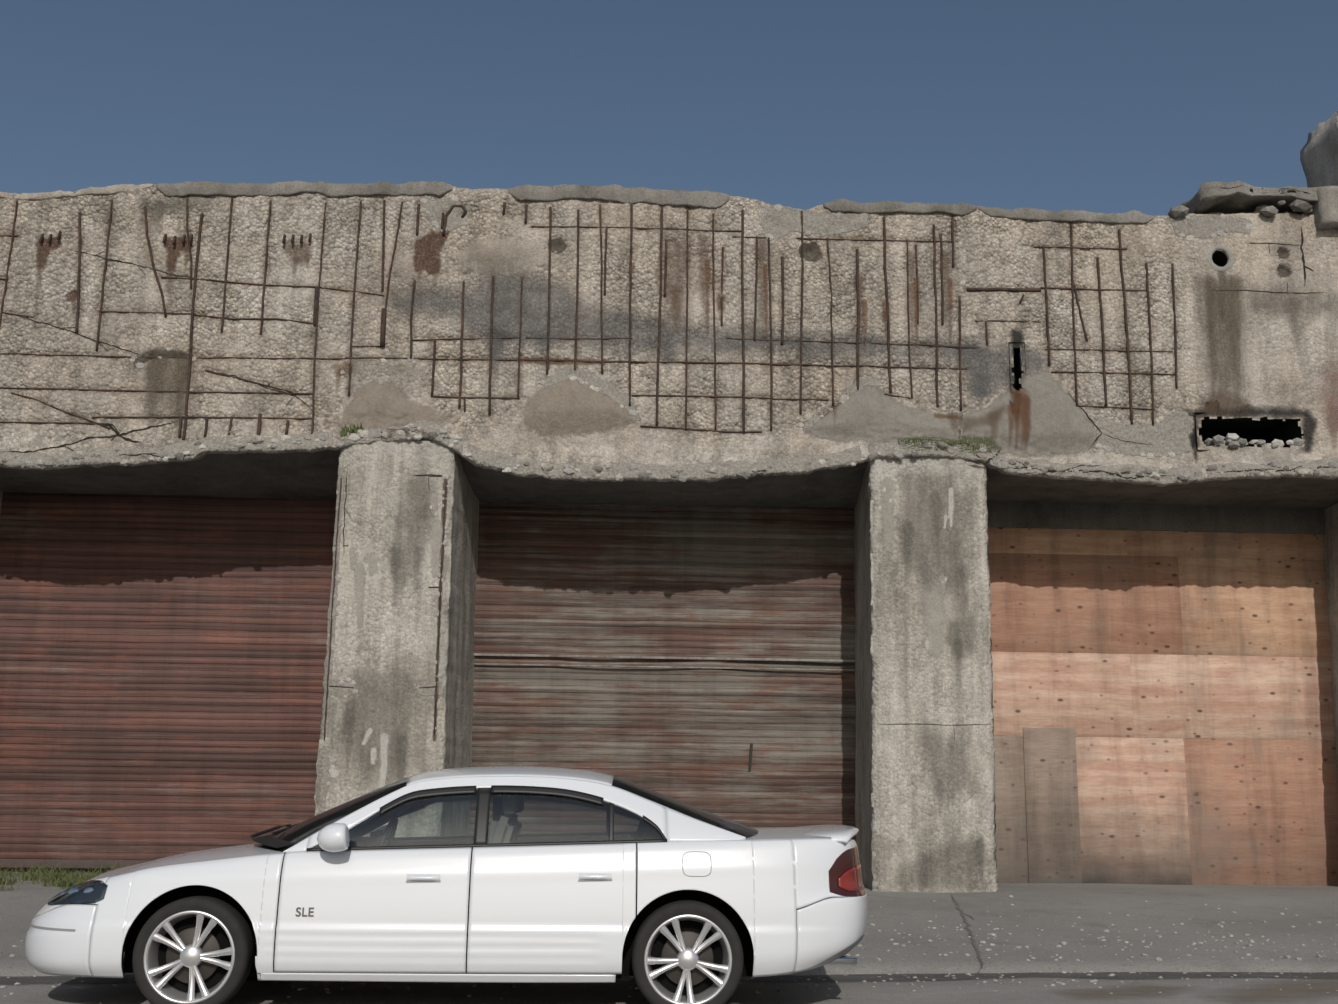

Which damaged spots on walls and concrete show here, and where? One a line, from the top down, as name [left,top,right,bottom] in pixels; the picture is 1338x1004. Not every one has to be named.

rust [36,237,61,269]
rust [165,237,191,269]
rust [414,231,448,274]
leakage [1189,271,1338,457]
crack [5,421,195,460]
spalling [0,196,1338,816]